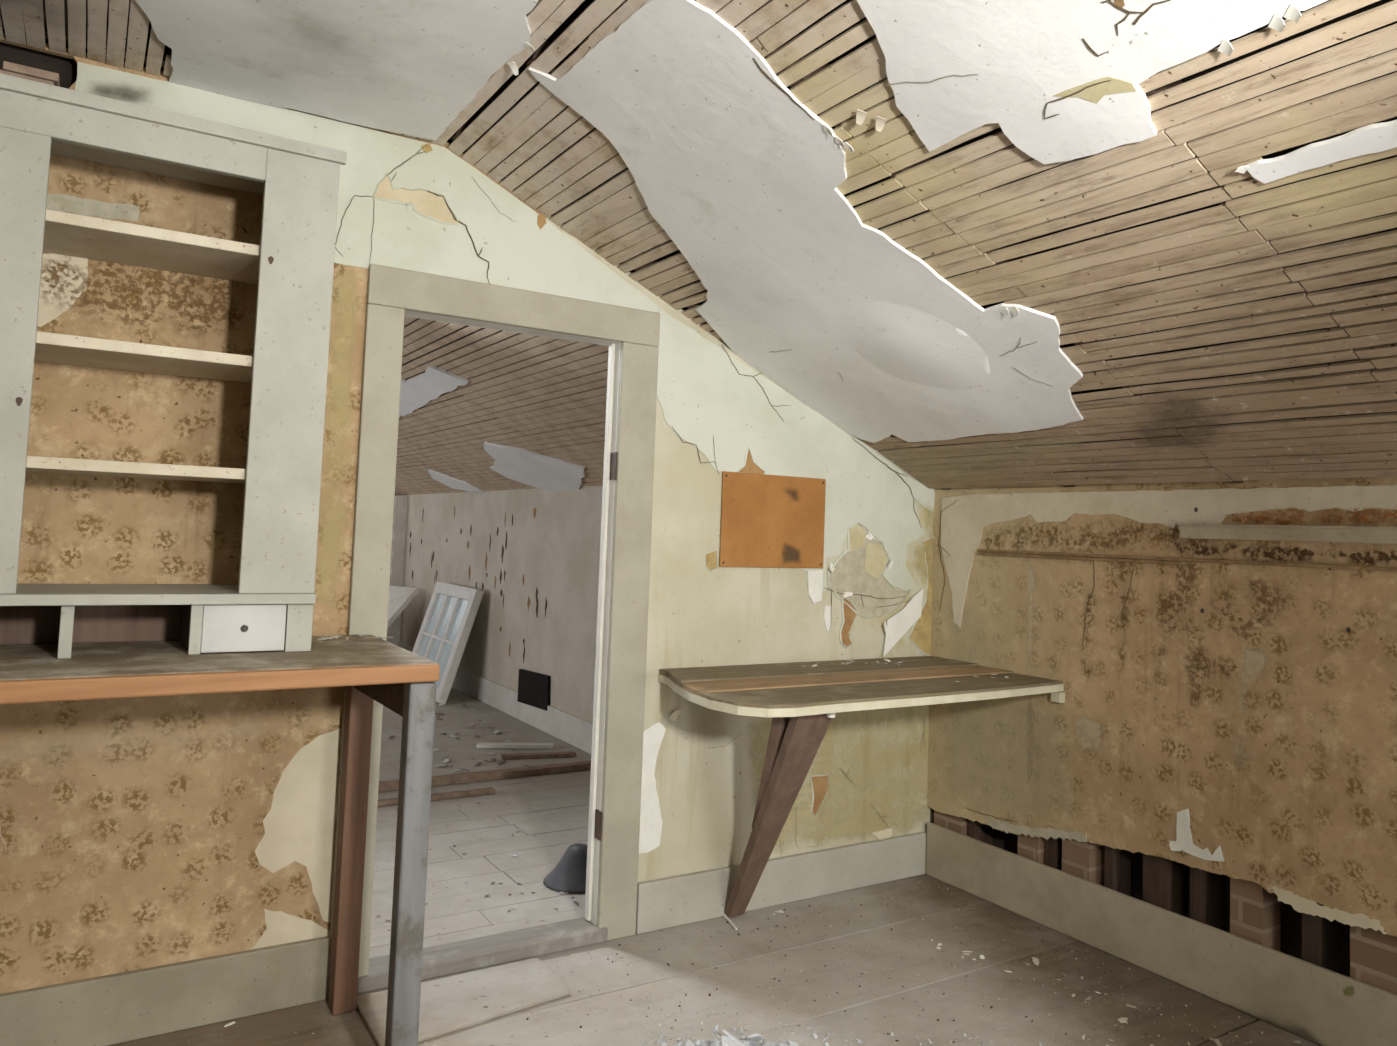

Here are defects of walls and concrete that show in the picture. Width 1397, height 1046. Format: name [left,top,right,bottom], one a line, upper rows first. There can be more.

spalling [0,0,173,89]
crack [1044,0,1170,119]
crack [335,144,428,265]
crack [427,191,490,284]
spalling [372,0,722,339]
spalling [694,0,1397,657]
spalling [395,316,609,584]
spalling [500,627,551,711]
peeling [639,706,681,854]
flaking render [984,817,1087,855]
spalling [1131,852,1143,900]
spalling [1267,886,1387,977]